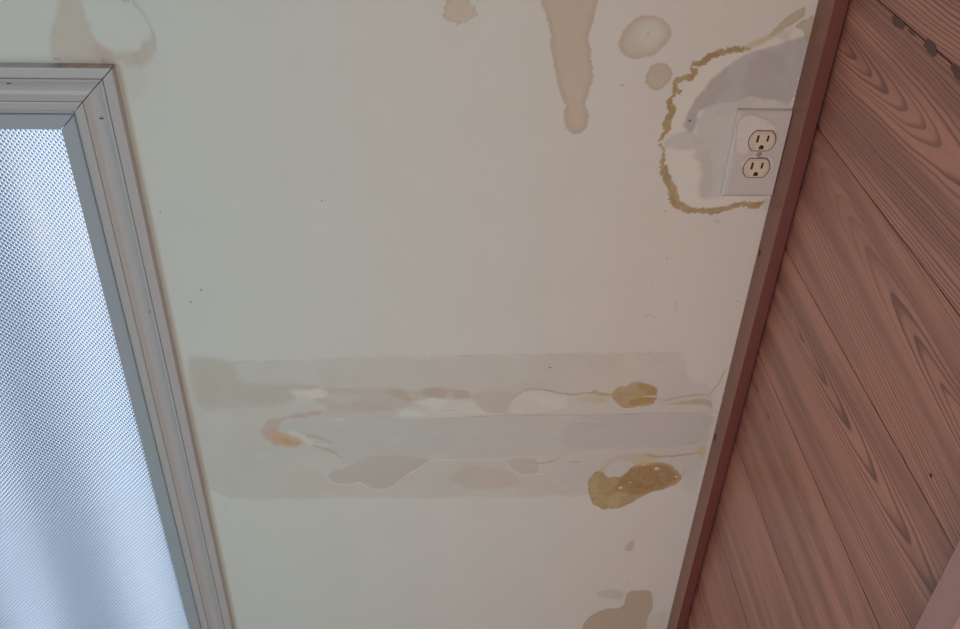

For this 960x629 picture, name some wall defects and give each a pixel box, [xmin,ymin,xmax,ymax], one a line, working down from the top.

water stain [440,0,479,27]
water stain [538,0,600,136]
water stain [617,6,814,216]
water stain [611,381,659,409]
peeling [182,349,719,501]
water stain [587,451,691,510]
water stain [582,589,668,629]